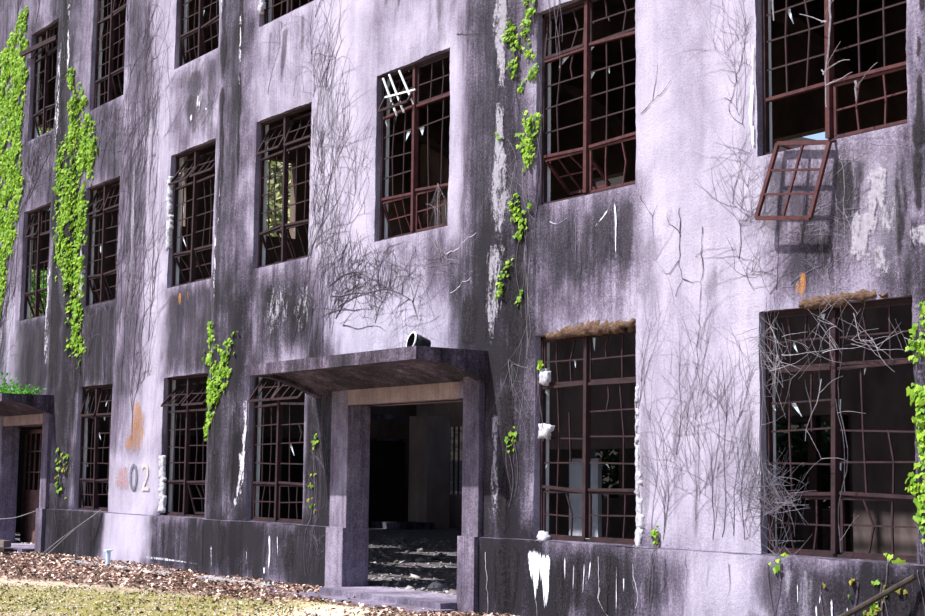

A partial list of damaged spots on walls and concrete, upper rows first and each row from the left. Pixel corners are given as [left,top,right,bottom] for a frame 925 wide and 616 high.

peeling [493,0,507,85]
water stain [187,0,227,205]
water stain [22,0,76,388]
peeling [491,106,510,232]
water stain [835,161,862,222]
peeling [851,167,896,276]
water stain [895,162,907,252]
peeling [487,247,503,331]
peeling [491,416,499,510]
water stain [263,532,292,572]
water stain [491,546,591,616]
water stain [877,576,920,616]